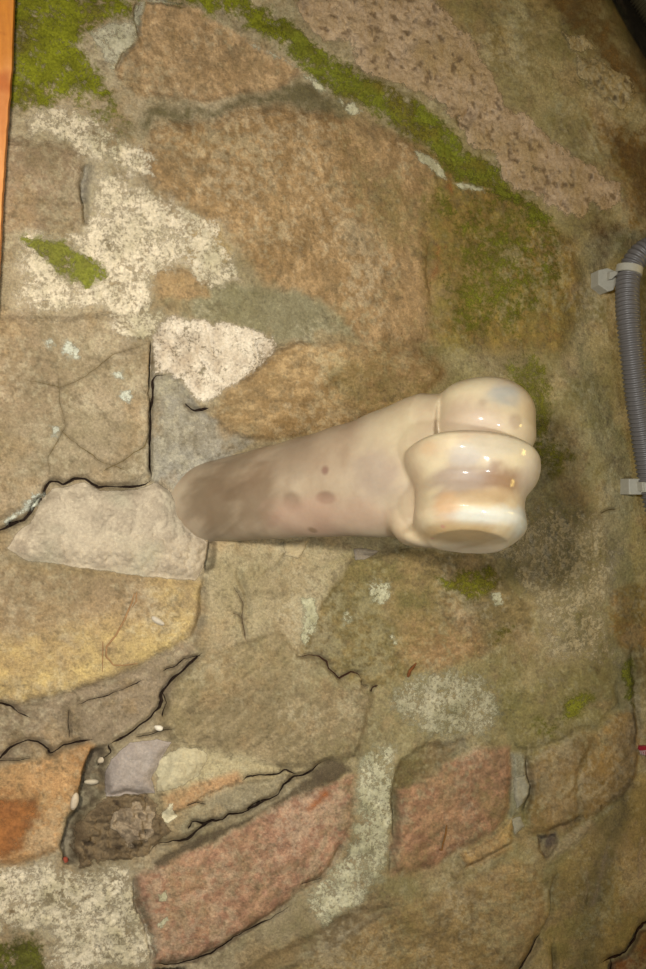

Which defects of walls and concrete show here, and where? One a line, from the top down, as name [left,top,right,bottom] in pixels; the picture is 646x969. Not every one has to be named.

crack [0,344,214,531]
crack [0,655,199,765]
crack [298,654,378,692]
crack [151,759,328,850]
crack [519,934,540,969]
crack [603,921,646,969]